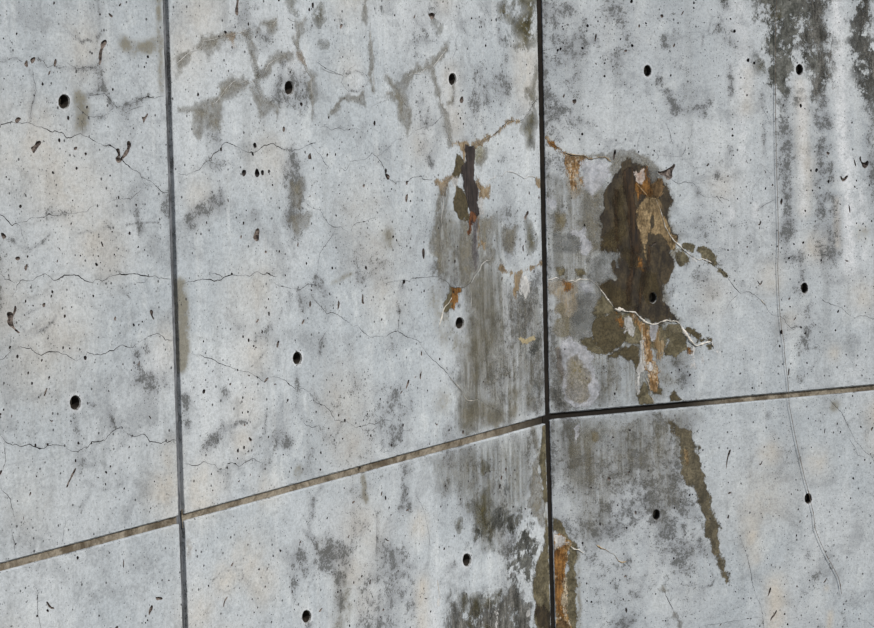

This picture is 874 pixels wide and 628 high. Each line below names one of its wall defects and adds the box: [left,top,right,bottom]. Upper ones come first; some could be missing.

water stain [752,0,833,102]
water stain [848,0,874,102]
crack [0,58,169,241]
crack [182,113,448,183]
rust [545,136,590,194]
spalling [658,164,675,180]
crack [0,183,505,423]
water stain [547,152,728,408]
crack [0,416,174,509]
water stain [444,425,584,628]
water stain [655,413,731,584]
rust [553,533,573,628]